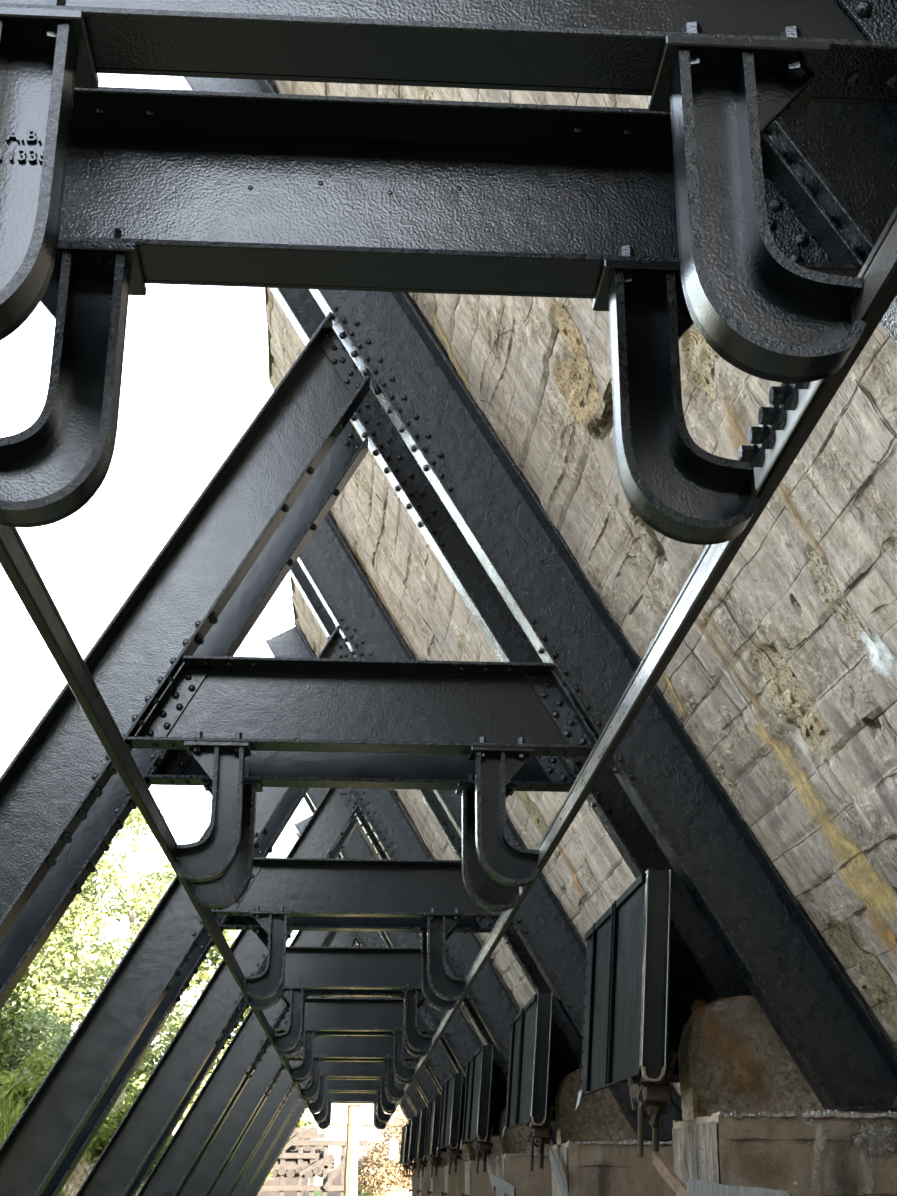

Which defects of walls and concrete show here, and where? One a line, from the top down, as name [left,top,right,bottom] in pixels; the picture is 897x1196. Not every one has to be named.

spalling [549,300,614,439]
crack [812,379,897,522]
crack [844,537,891,594]
crack [686,596,821,738]